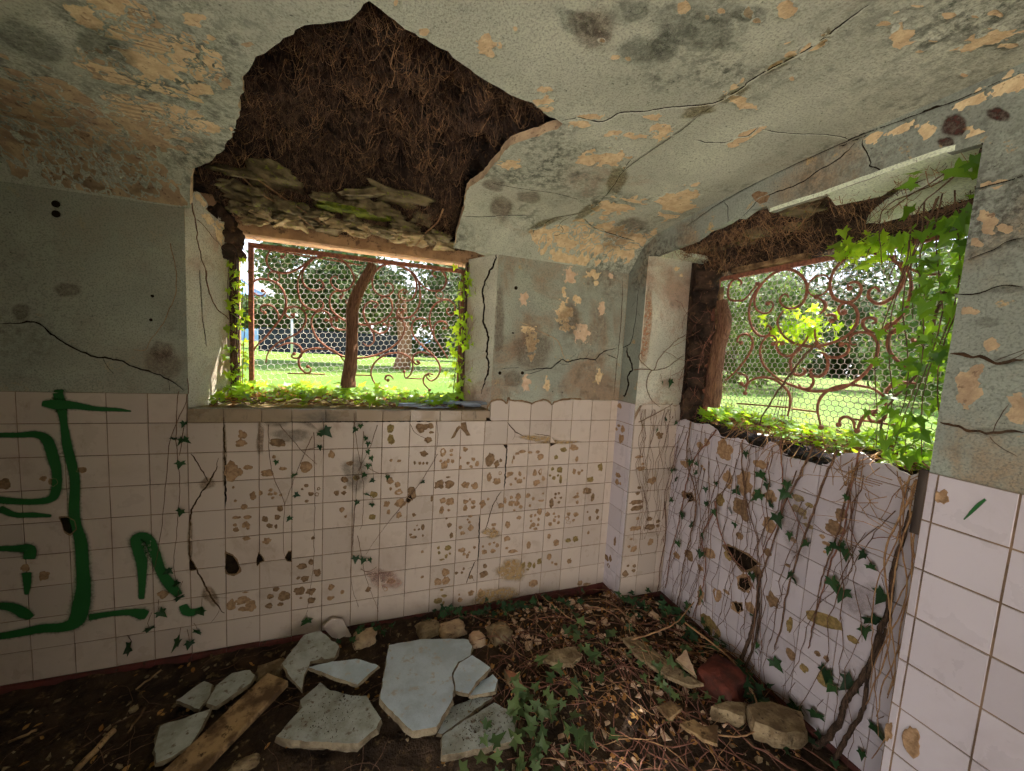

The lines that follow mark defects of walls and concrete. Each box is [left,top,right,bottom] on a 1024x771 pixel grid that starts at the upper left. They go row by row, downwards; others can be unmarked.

peeling [0,0,236,220]
crack [462,5,1024,241]
damp [938,115,966,146]
damp [987,107,1010,120]
crack [0,318,186,391]
crack [480,255,497,394]
peeling [527,181,705,346]
crack [948,350,1024,369]
crack [188,419,227,621]
spalling [224,550,344,612]
spalling [389,422,603,605]
spalling [673,438,777,638]